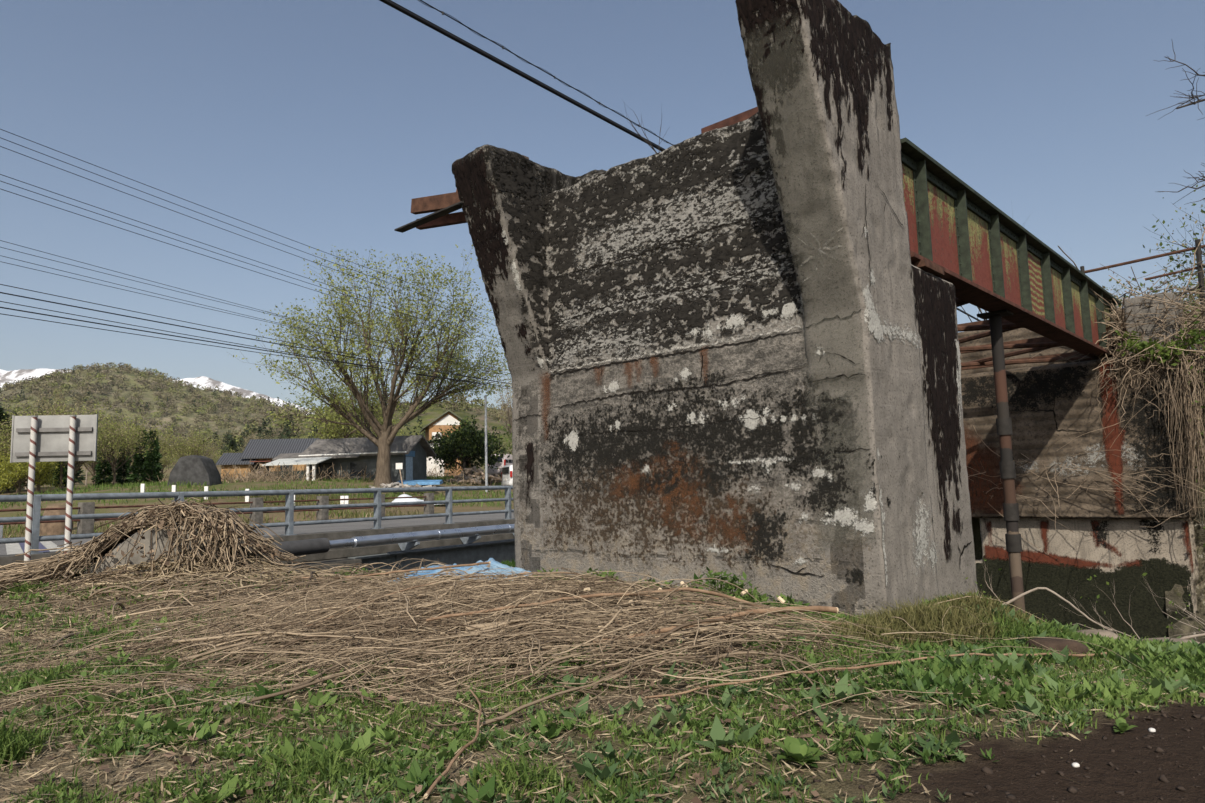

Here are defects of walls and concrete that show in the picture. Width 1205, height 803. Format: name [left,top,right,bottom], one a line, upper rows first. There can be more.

water stain [452,0,893,380]
water stain [524,370,884,571]
water stain [846,568,866,585]
water stain [869,265,1090,561]
water stain [976,373,1194,639]